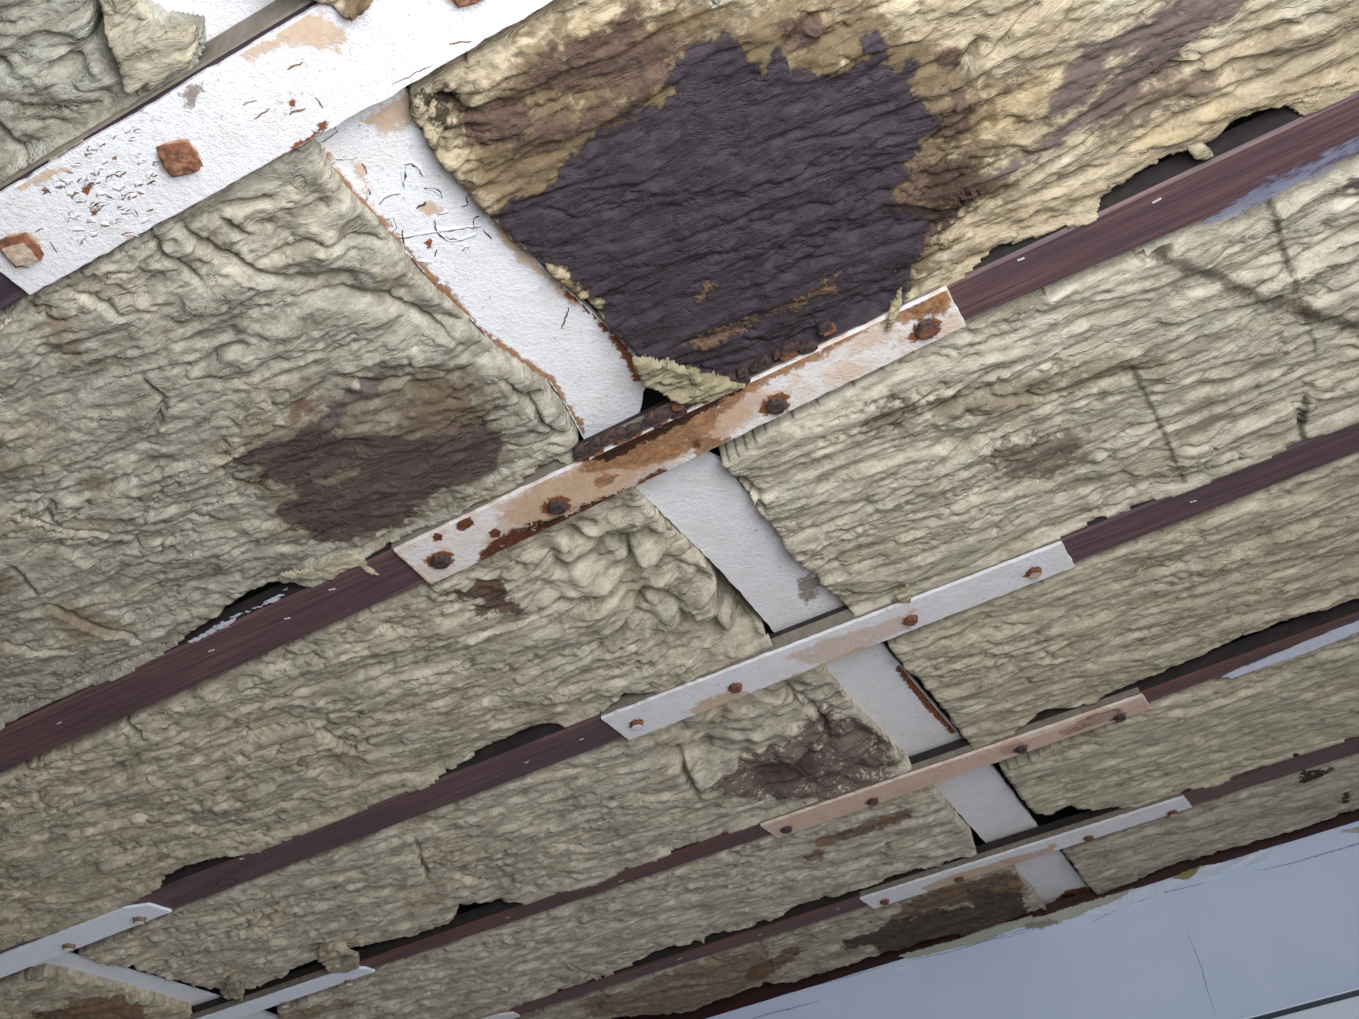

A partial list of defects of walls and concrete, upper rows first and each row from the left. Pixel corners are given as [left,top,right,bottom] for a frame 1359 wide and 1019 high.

leakage [345,0,373,21]
corrosion [16,168,68,195]
corrosion [81,179,102,215]
leakage [414,0,1245,376]
corrosion [282,121,951,562]
leakage [233,374,504,542]
corrosion [397,533,524,620]
corrosion [896,665,956,734]
leakage [691,702,900,804]